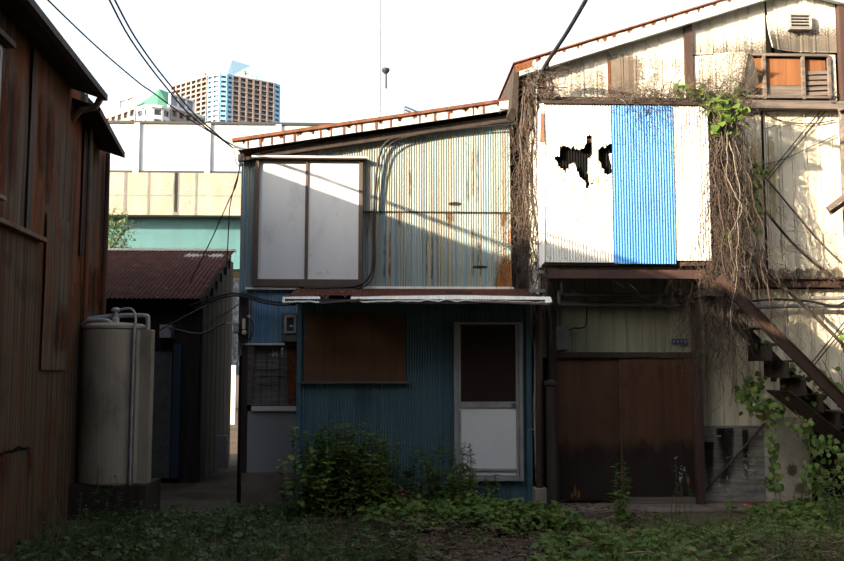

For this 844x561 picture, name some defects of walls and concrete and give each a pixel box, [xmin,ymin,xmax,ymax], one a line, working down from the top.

rust [495,259,512,287]